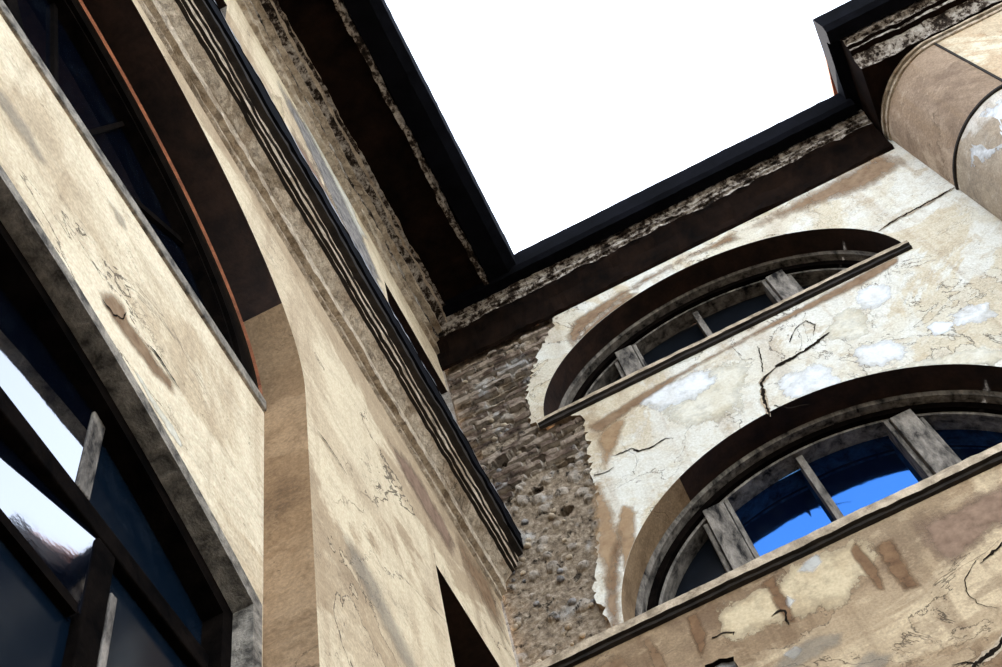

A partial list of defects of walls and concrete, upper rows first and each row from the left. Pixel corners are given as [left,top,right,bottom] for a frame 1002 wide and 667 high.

peeling [970,100,1002,167]
damp [104,295,172,389]
crack [757,320,829,417]
crack [594,438,673,475]
spalling [444,317,611,667]
peeling [717,539,876,641]
crack [964,542,1002,608]
spalling [705,656,738,667]
crack [954,633,1002,667]